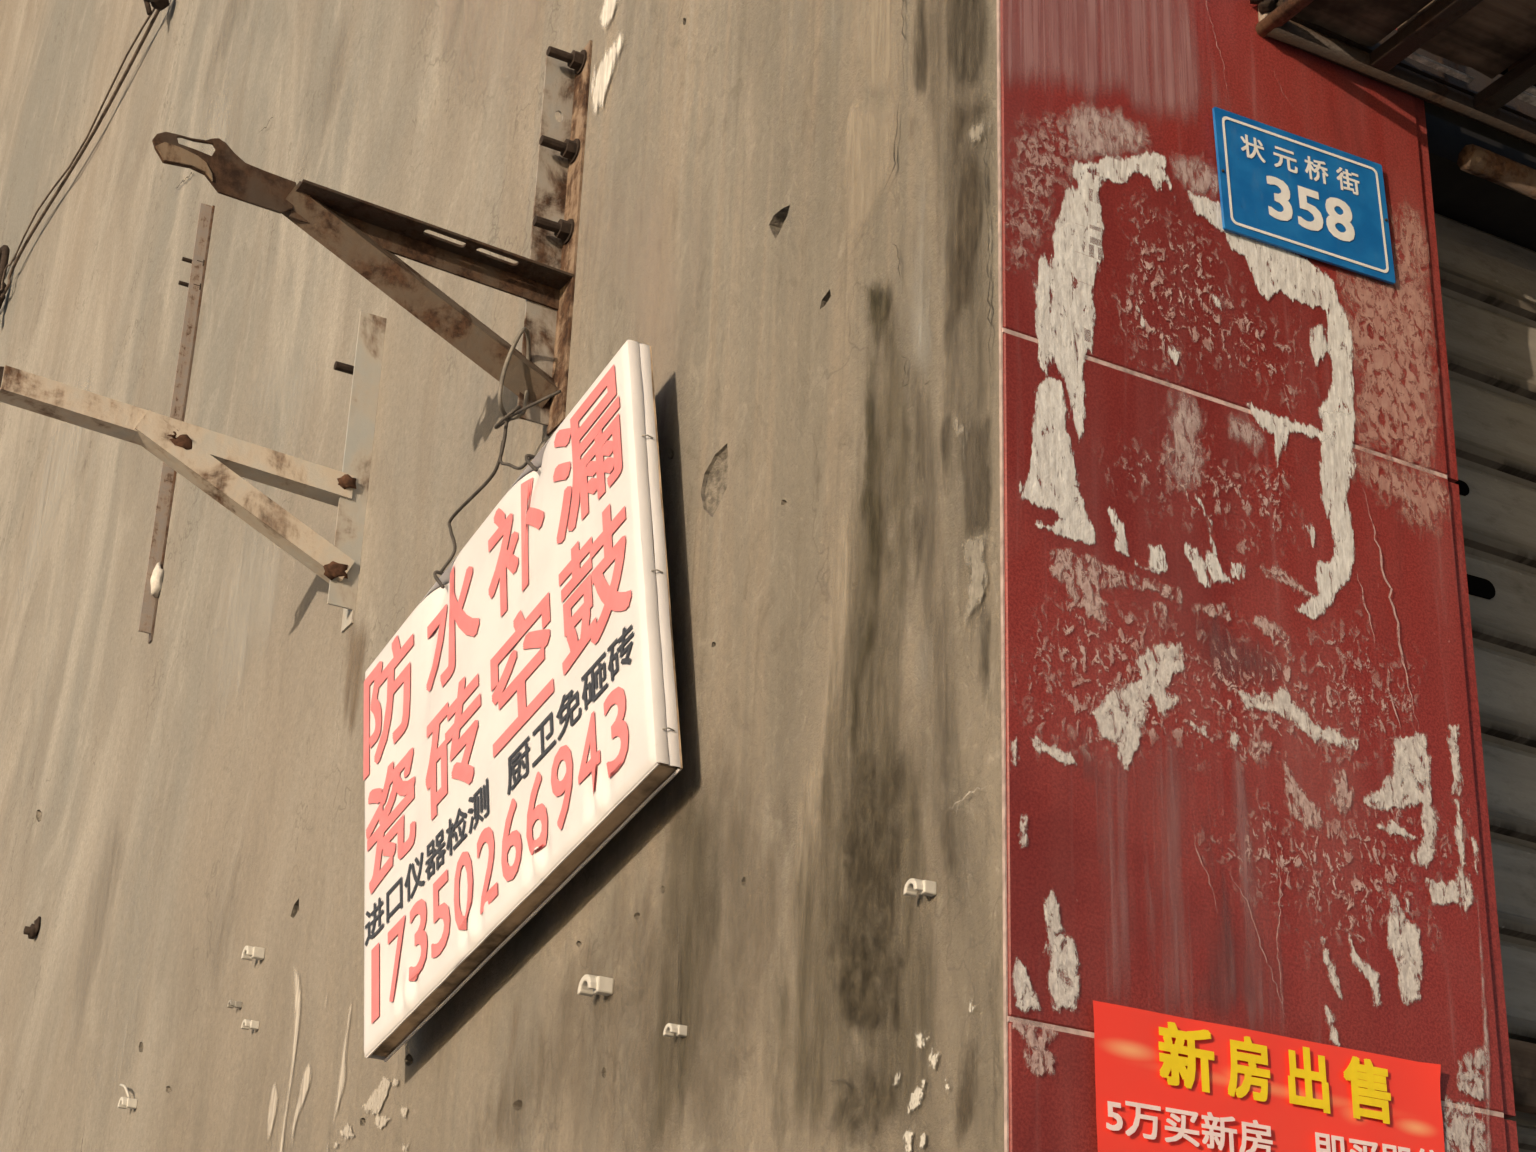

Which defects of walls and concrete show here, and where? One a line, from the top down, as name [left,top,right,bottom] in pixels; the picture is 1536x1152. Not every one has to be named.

damp [914,0,924,87]
damp [945,159,979,330]
peeling [1019,159,1449,623]
damp [795,327,925,1134]
peeling [1011,736,1077,766]
peeling [1092,642,1184,770]
peeling [1238,687,1358,750]
damp [658,805,700,1118]
peeling [1012,891,1079,1076]
peeling [1214,725,1478,1046]
peeling [334,1077,407,1148]
damp [957,1055,973,1130]